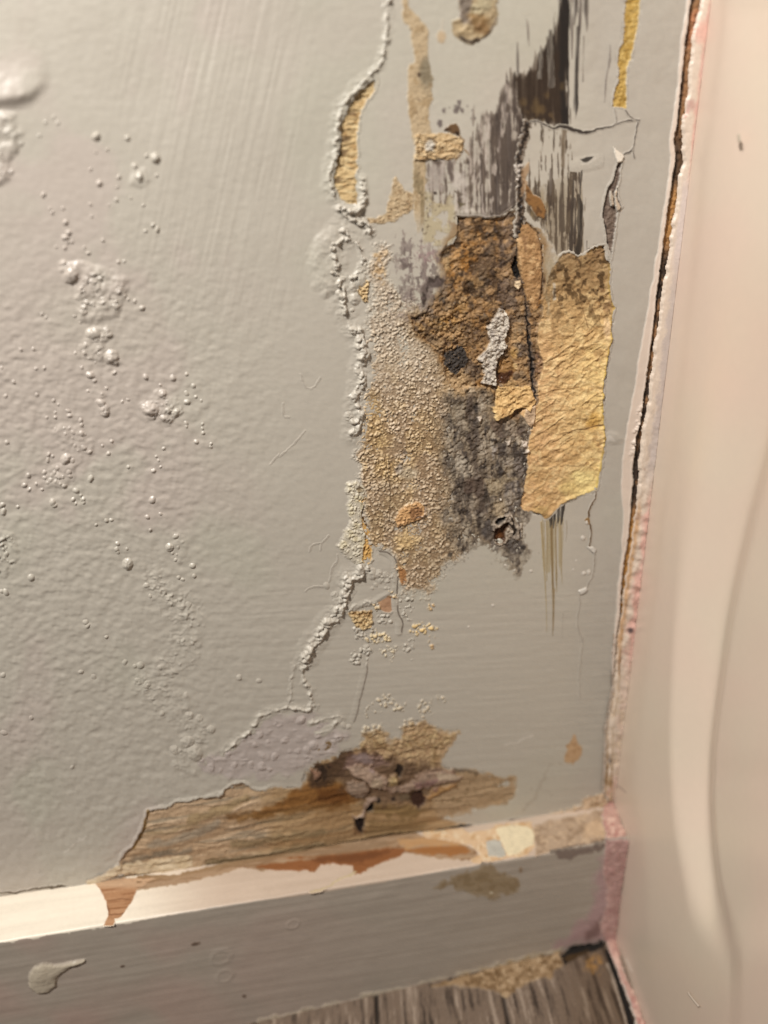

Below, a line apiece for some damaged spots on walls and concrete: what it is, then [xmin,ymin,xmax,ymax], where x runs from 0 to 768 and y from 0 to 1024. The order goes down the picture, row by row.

peeling [85,0,691,927]
water stain [348,0,593,667]
crack [602,0,701,802]